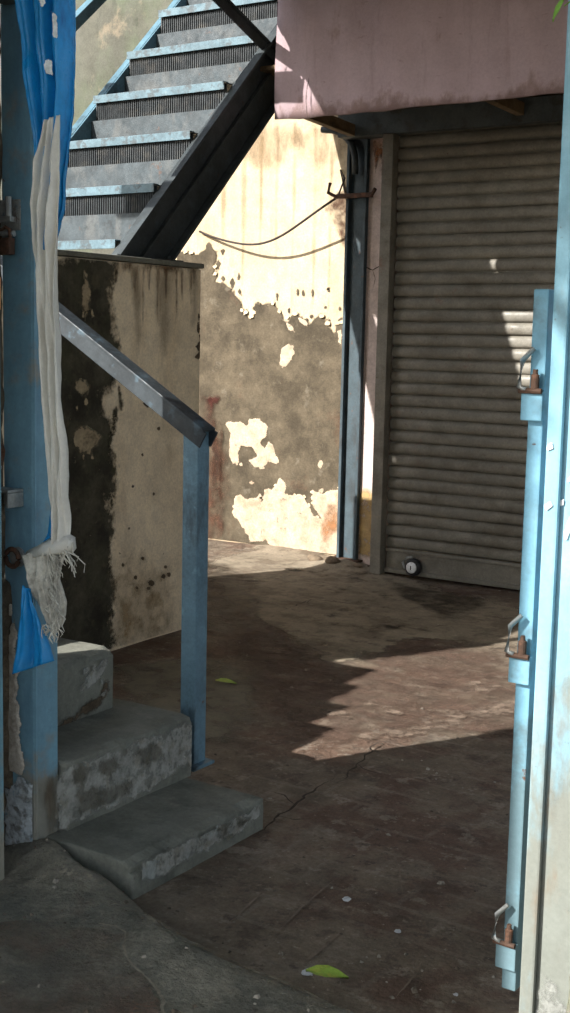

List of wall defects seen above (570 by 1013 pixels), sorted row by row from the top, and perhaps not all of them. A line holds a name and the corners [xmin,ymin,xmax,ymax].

leakage [58,258,121,350]
leakage [57,335,123,649]
flaking render [177,242,343,555]
crack [256,741,380,834]